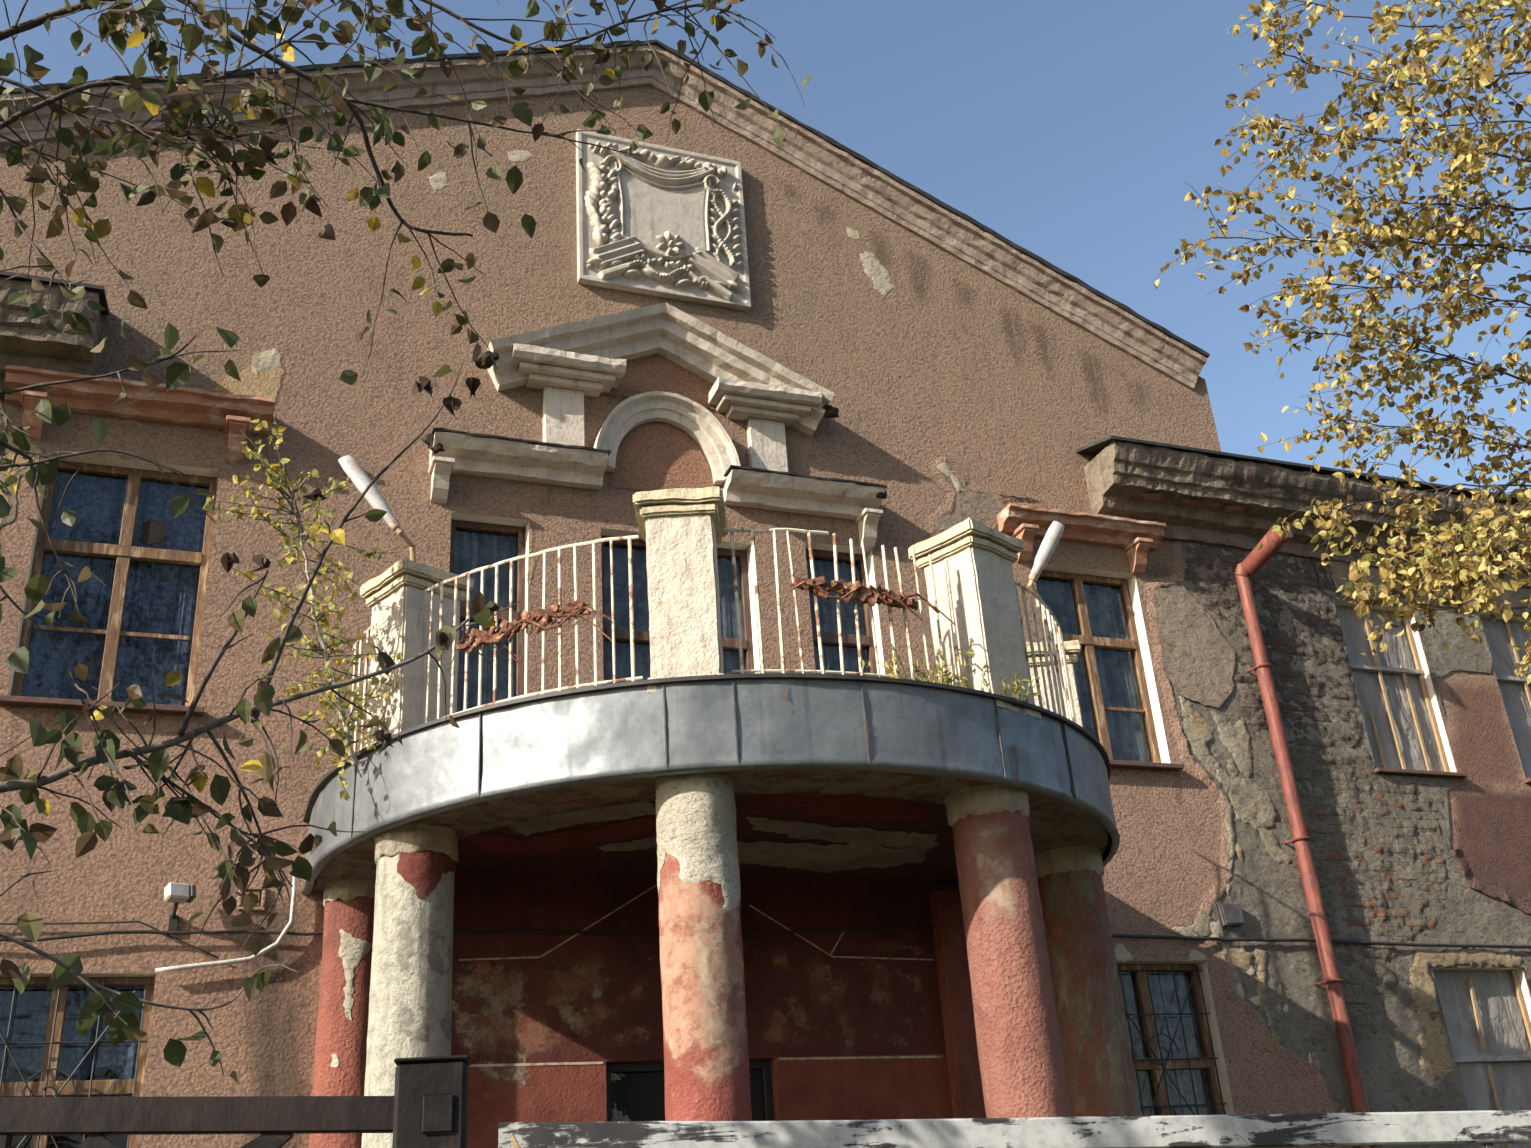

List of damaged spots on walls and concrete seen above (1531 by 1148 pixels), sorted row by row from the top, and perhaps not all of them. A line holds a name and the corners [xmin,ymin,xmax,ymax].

peeling [846,227,895,295]
peeling [210,348,284,399]
flaking render [1159,541,1531,1113]
leakage [1456,690,1531,903]
peeling [397,850,457,899]
peeling [338,929,372,1020]
peeling [397,920,642,1085]
peeling [508,773,939,1086]
peeling [1115,944,1133,962]